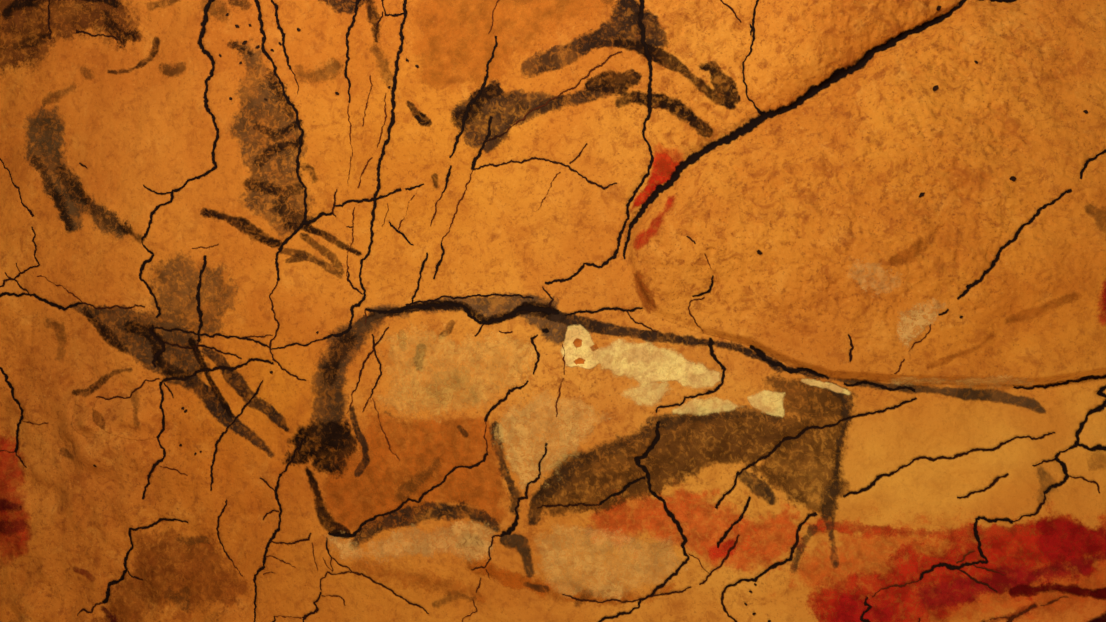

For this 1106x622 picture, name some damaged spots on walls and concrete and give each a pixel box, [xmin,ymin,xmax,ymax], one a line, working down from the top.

crack [77,518,188,616]
crack [216,328,549,622]
crack [0,0,966,499]
crack [462,149,1106,622]